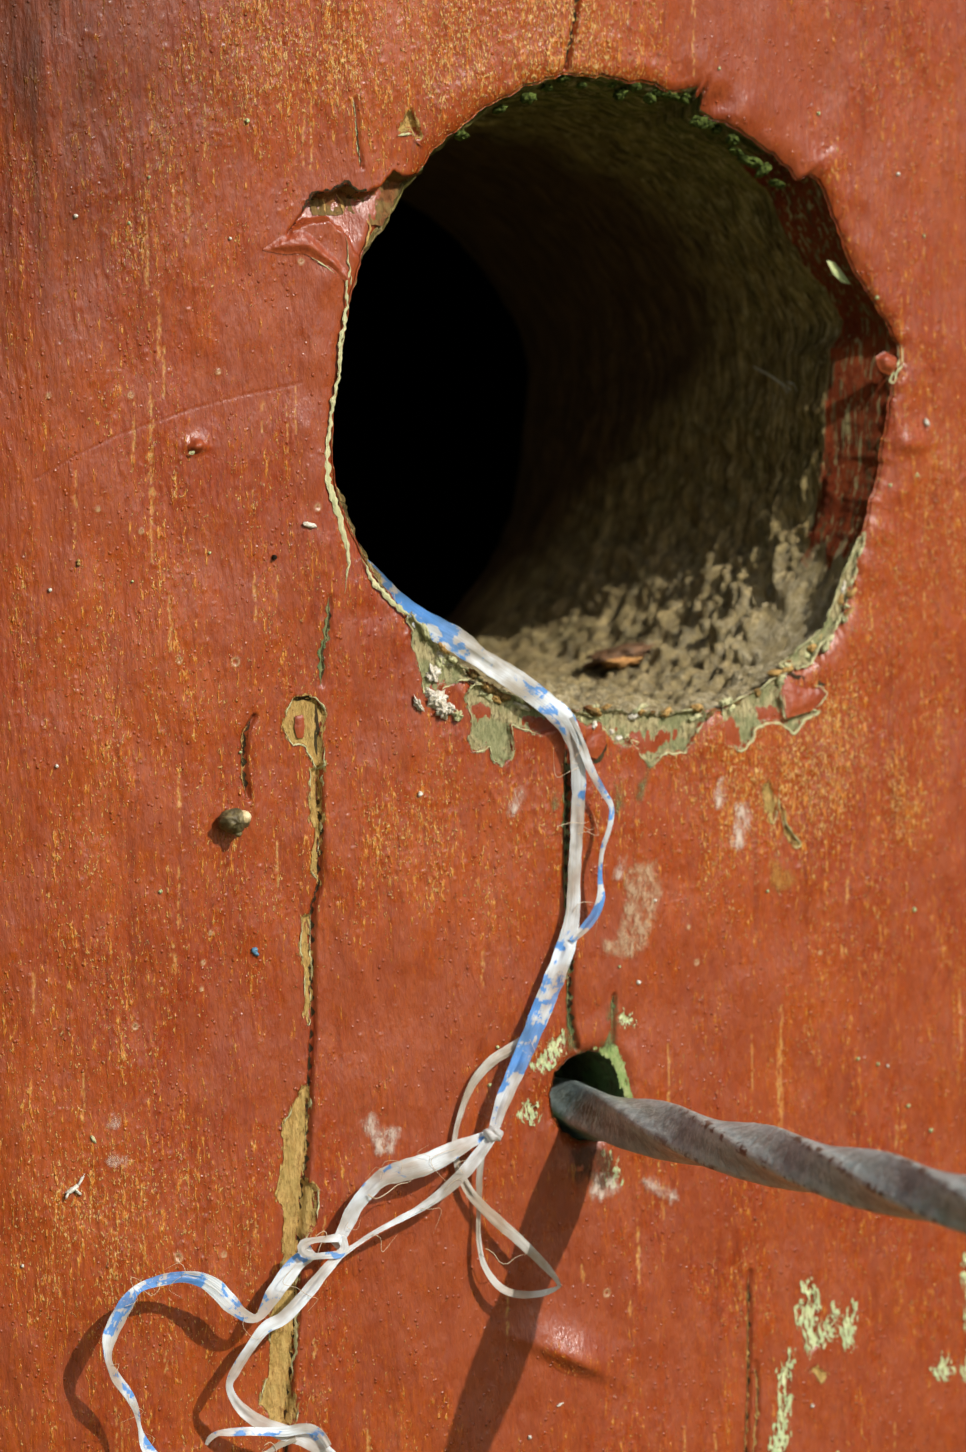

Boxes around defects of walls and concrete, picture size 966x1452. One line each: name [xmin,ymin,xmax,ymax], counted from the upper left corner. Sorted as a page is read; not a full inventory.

spalling [298,170,422,245]
peeling [827,261,851,284]
peeling [573,532,866,768]
crack [241,717,253,797]
peeling [529,1029,567,1075]
peeling [593,1007,637,1098]
crack [282,778,324,1452]
peeling [516,1099,542,1126]
peeling [768,1277,858,1452]
peeling [929,1352,966,1382]